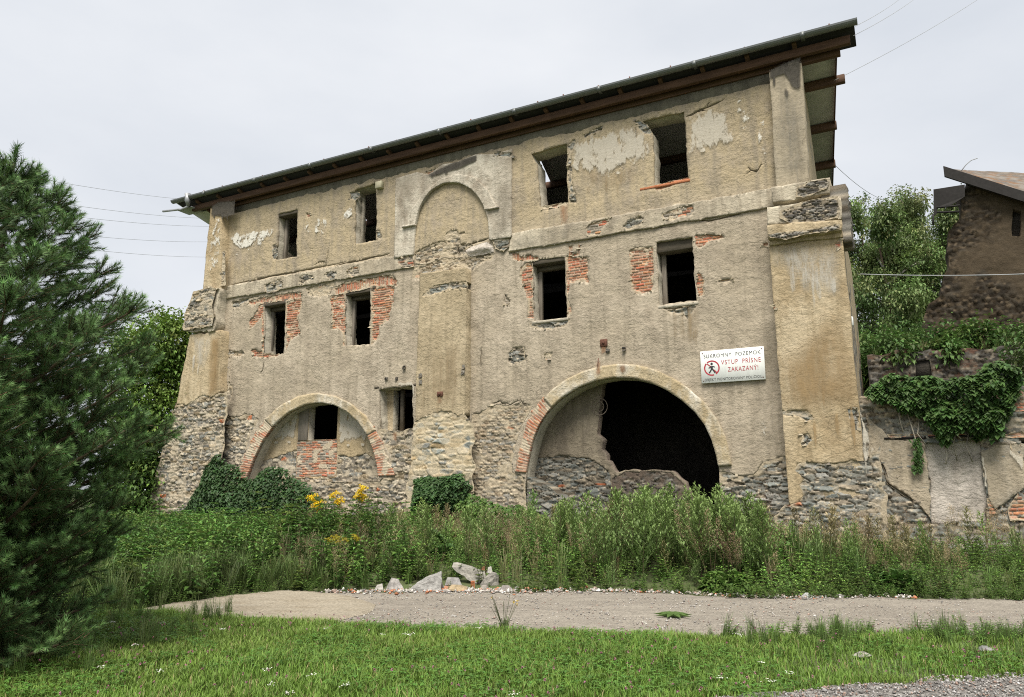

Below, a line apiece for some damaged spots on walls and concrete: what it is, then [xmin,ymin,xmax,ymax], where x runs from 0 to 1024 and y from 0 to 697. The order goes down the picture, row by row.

peeling [541,119,652,210]
spalling [761,178,845,251]
spalling [184,219,278,331]
flaking render [227,216,612,368]
flaking render [628,246,654,294]
spalling [668,273,705,319]
crack [869,457,931,520]